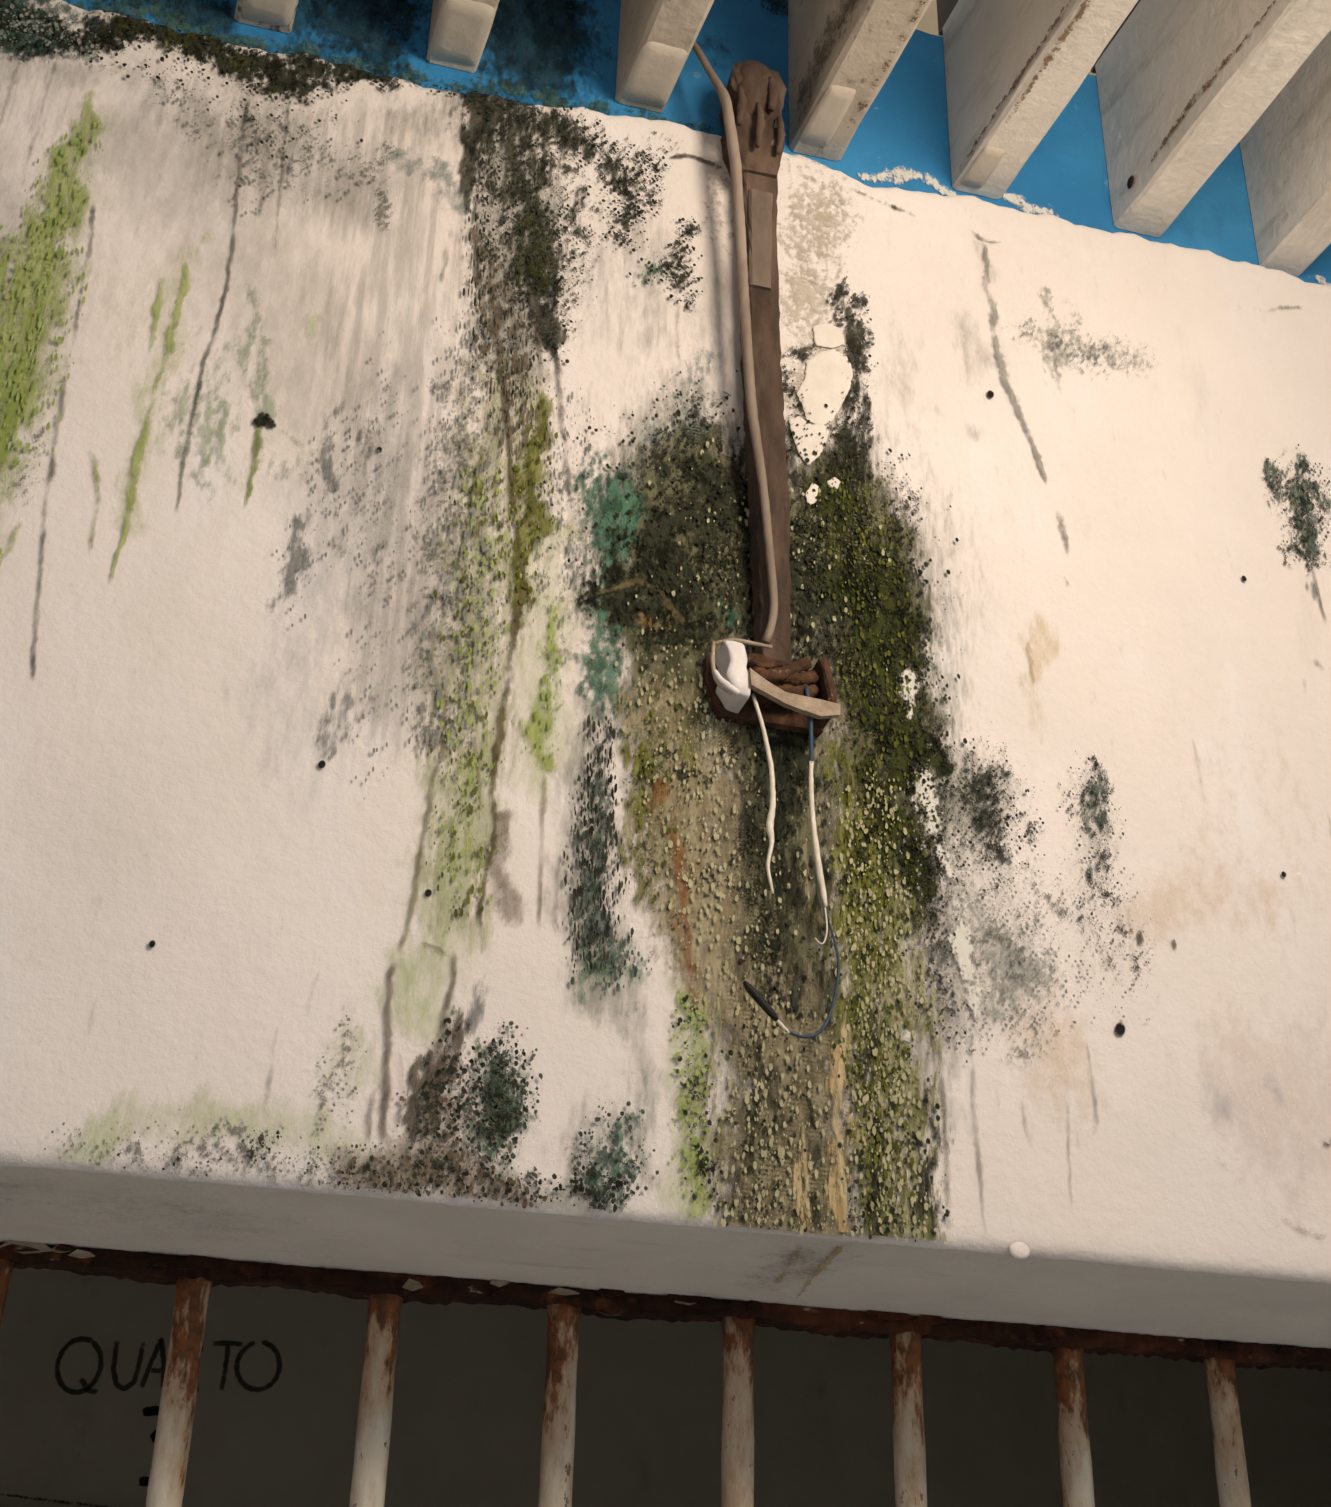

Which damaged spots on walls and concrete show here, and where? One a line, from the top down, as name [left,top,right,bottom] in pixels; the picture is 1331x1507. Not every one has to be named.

damp [0,0,724,946]
damp [323,943,659,1213]
damp [562,287,1177,1242]
damp [1262,444,1331,616]